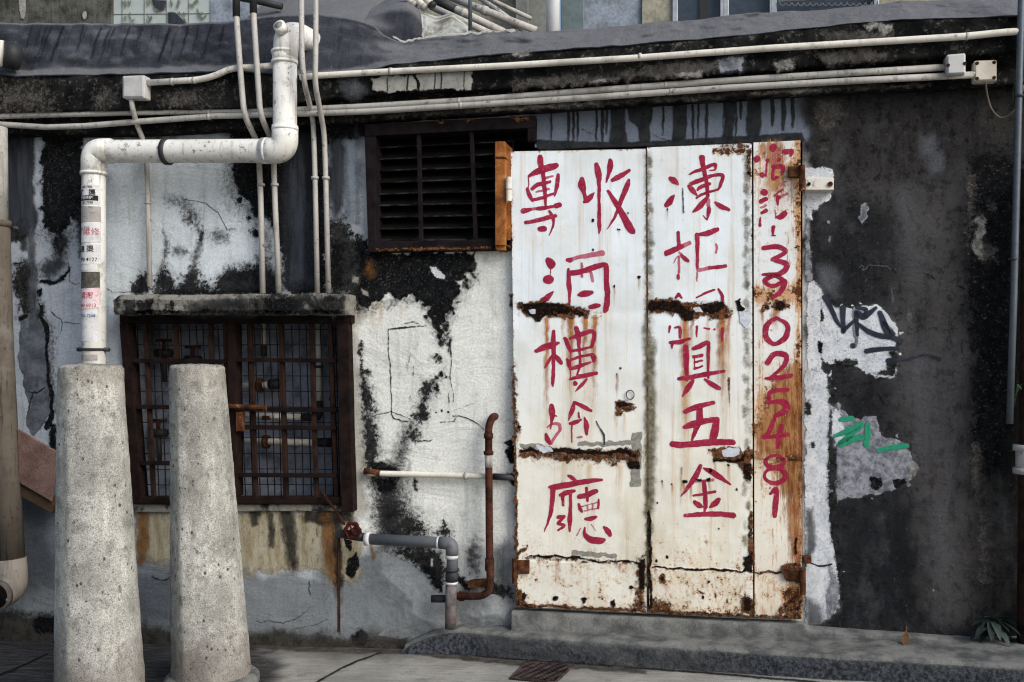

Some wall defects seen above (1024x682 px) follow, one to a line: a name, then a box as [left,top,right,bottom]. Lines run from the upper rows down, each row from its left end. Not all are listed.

water stain [0,78,61,120]
water stain [90,82,117,112]
water stain [357,332,456,593]
water stain [122,56,933,321]
rust [637,225,653,279]
rust [509,267,804,620]
rust [715,139,792,193]
peeling [805,95,849,178]
peeling [803,192,919,626]
water stain [958,144,1024,594]